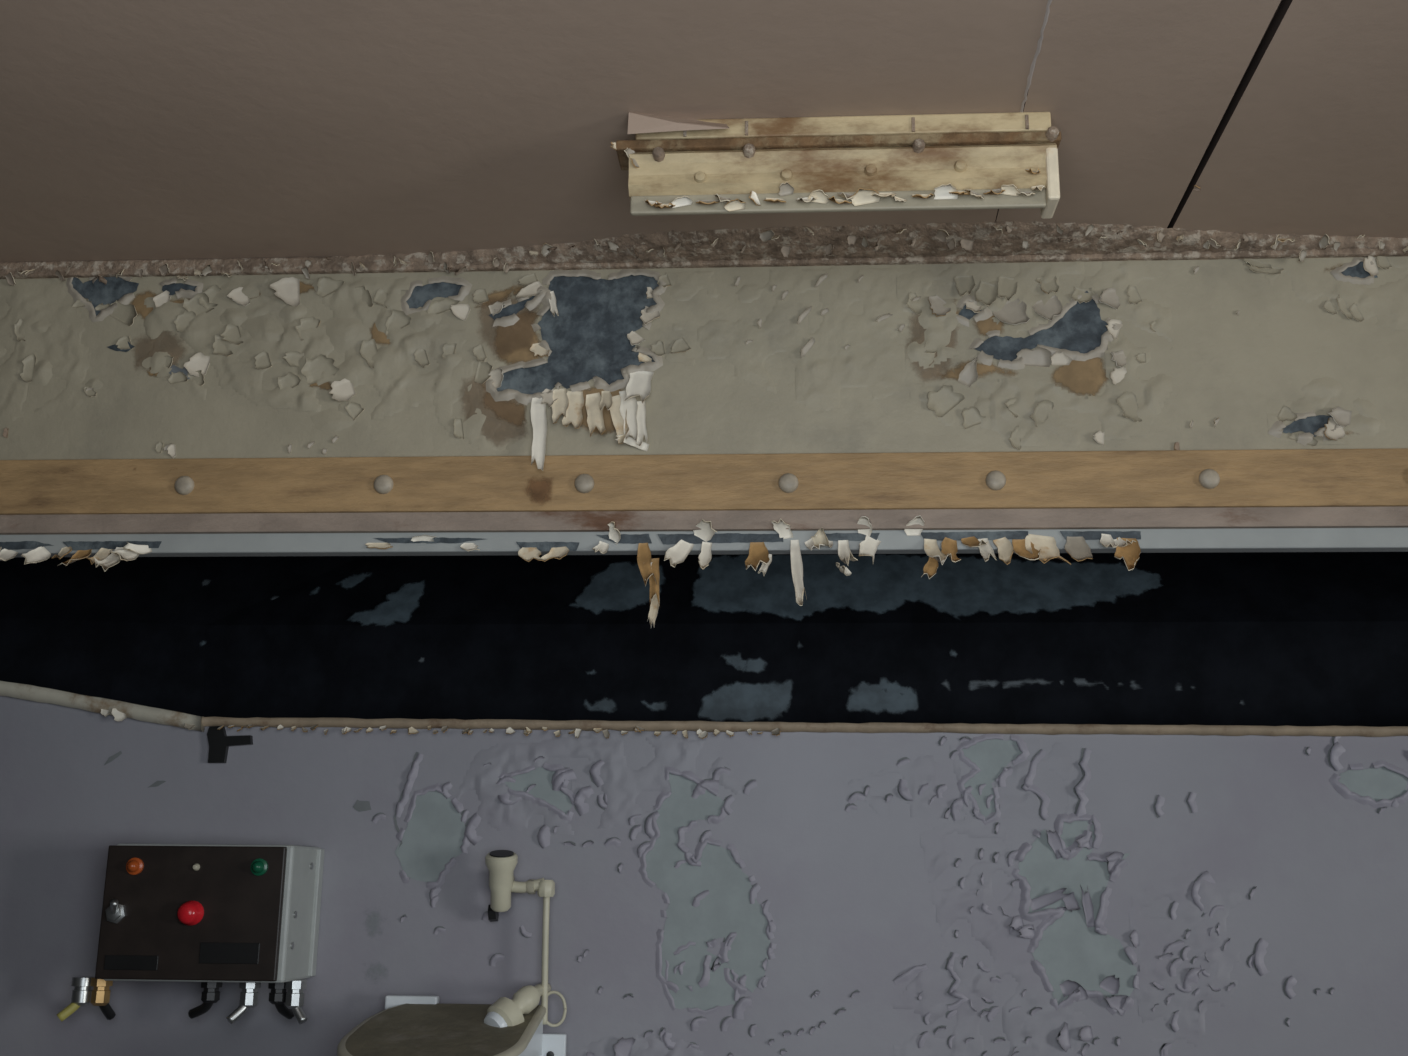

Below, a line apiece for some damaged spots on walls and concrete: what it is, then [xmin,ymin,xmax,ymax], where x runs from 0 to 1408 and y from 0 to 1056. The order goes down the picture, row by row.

peeling [1323,256,1392,322]
peeling [66,269,691,471]
peeling [897,260,1173,450]
peeling [1267,377,1389,446]
peeling [0,541,162,571]
peeling [516,516,1161,626]
peeling [217,654,792,739]
peeling [847,678,918,713]
peeling [954,813,1139,1056]
peeling [643,936,774,1050]